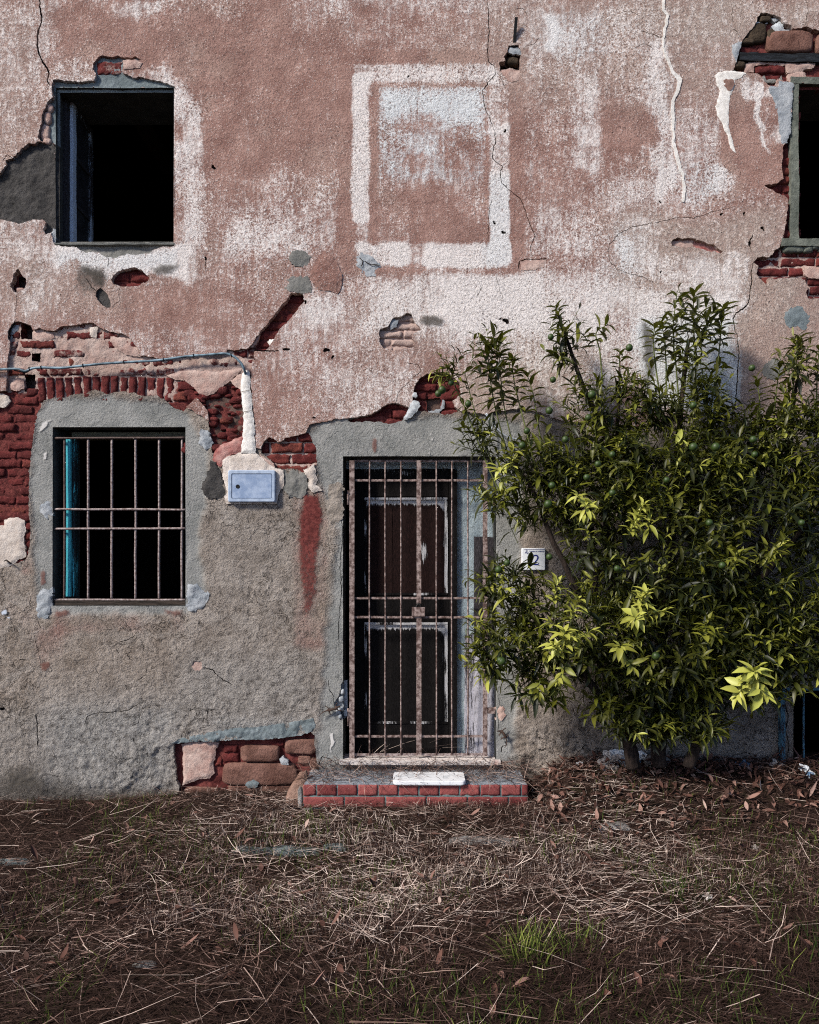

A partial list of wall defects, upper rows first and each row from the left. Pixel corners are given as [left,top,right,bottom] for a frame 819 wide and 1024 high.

crack [37,0,50,85]
flaking render [0,57,174,258]
crack [477,3,545,298]
crack [608,0,725,277]
flaking render [715,16,819,299]
flaking render [96,270,149,308]
flaking render [671,239,721,254]
flaking render [379,315,420,351]
flaking render [0,295,307,568]
flaking render [260,433,322,493]
flaking render [175,732,321,793]